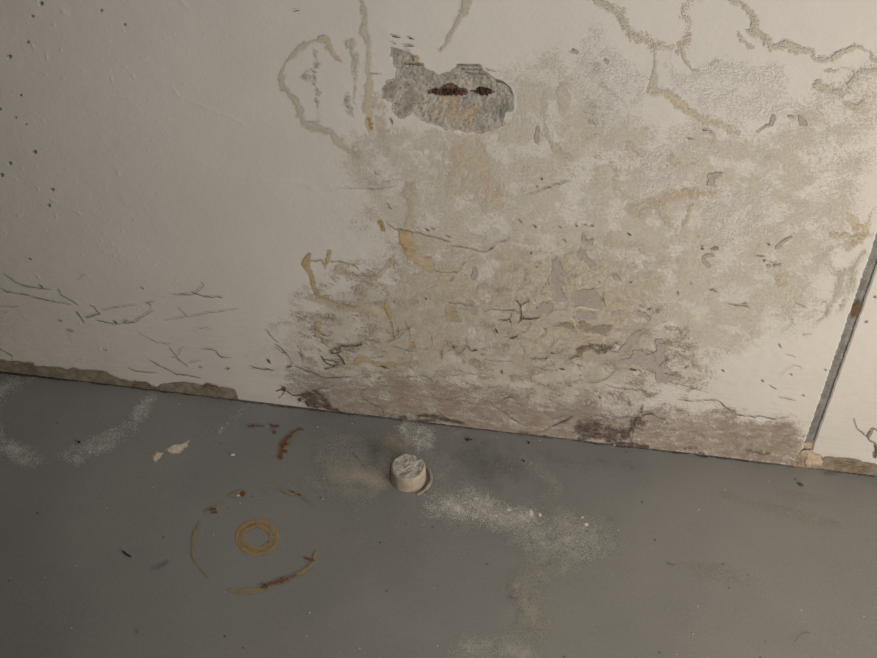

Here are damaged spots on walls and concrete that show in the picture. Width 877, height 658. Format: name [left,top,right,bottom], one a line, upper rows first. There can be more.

spalling [382,36,514,135]
crack [387,222,511,282]
peeling [0,360,238,400]
crack [0,273,433,415]
water stain [242,0,877,658]
crack [440,300,803,439]
crack [854,418,877,459]
corrosion [236,519,280,556]